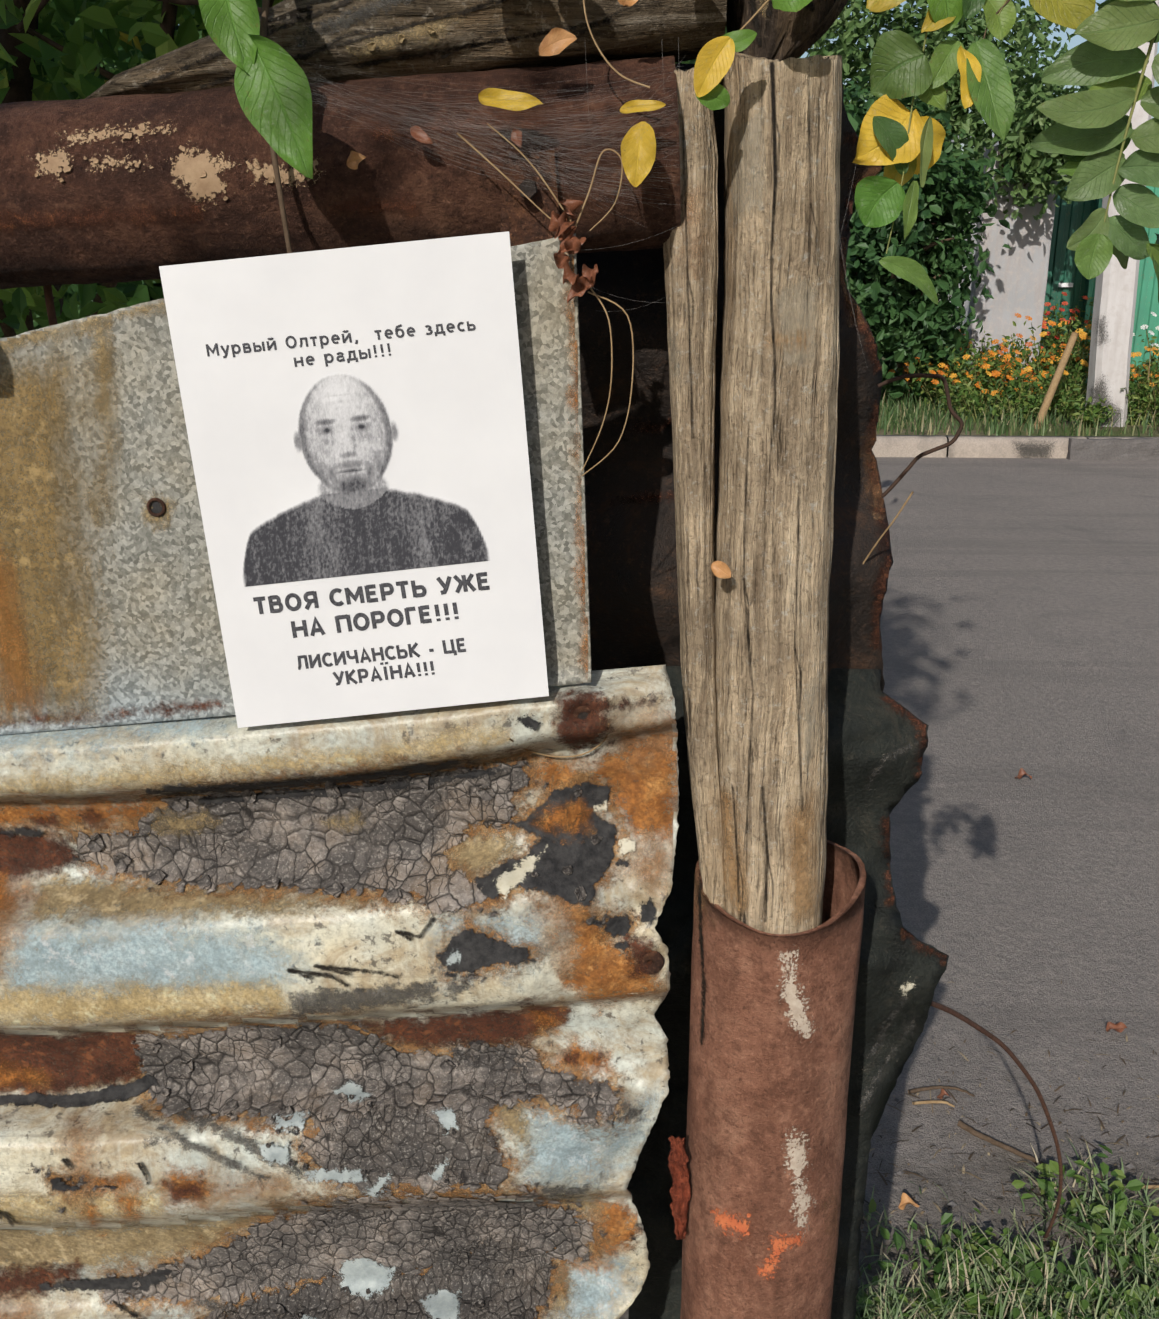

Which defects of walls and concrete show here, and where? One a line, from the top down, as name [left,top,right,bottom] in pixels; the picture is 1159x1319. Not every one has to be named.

peeling [27,119,326,211]
corrosion [355,495,678,1049]
corrosion [0,728,502,949]
crack [61,749,540,941]
peeling [493,844,548,899]
peeling [591,835,639,857]
corrosion [0,980,287,1096]
corrosion [554,1040,614,1075]
crack [98,964,629,1318]